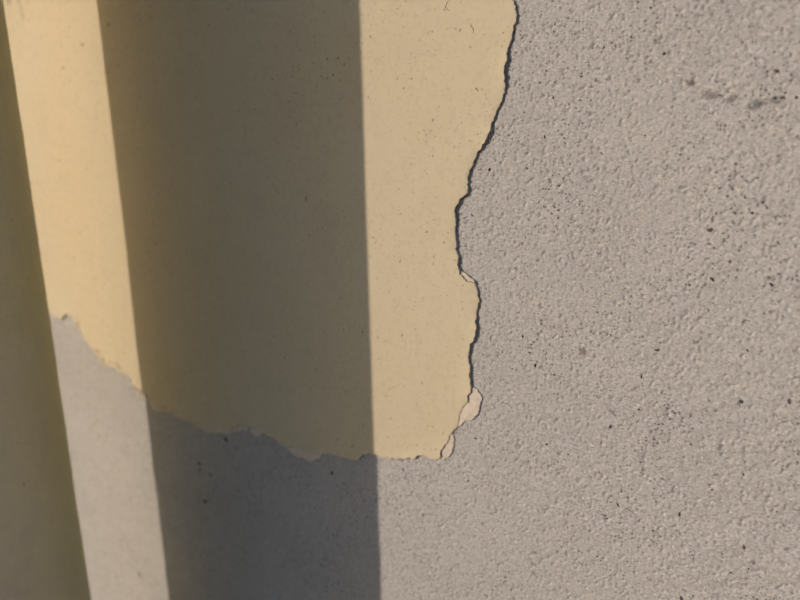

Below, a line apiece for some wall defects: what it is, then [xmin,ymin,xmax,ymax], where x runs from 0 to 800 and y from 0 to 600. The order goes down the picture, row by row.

peeling [462,0,518,198]
peeling [454,198,481,341]
peeling [439,433,455,460]
peeling [458,386,482,426]